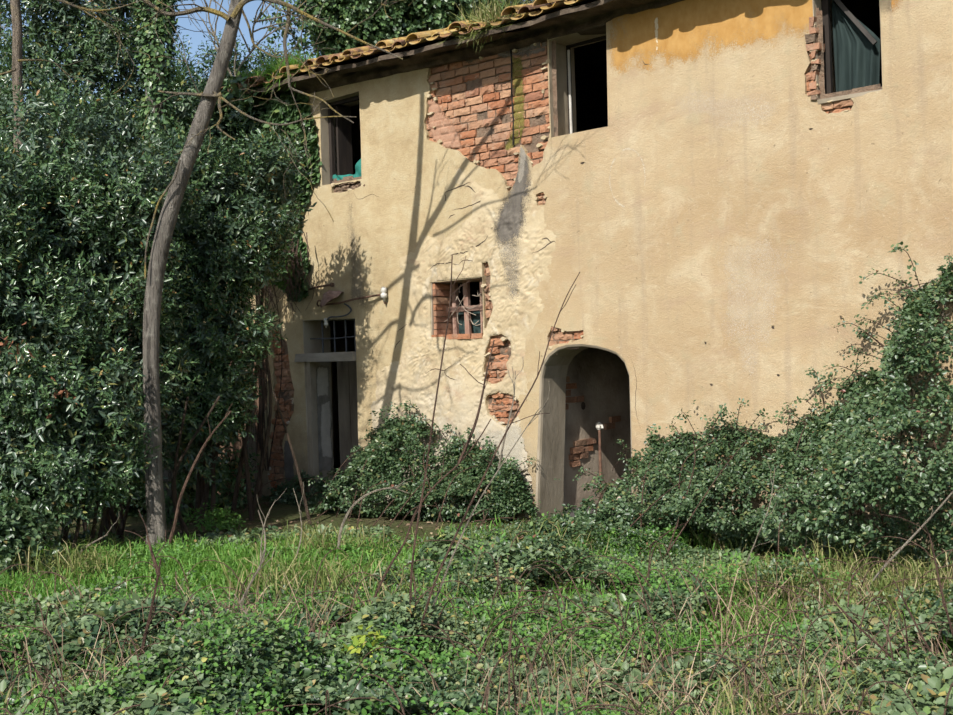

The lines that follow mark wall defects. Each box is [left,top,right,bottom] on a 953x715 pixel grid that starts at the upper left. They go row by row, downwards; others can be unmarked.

damp [608,0,813,79]
spalling [804,8,882,114]
flaking render [267,330,294,496]
flaking render [367,40,558,520]
damp [493,147,532,299]
spalling [549,327,584,355]